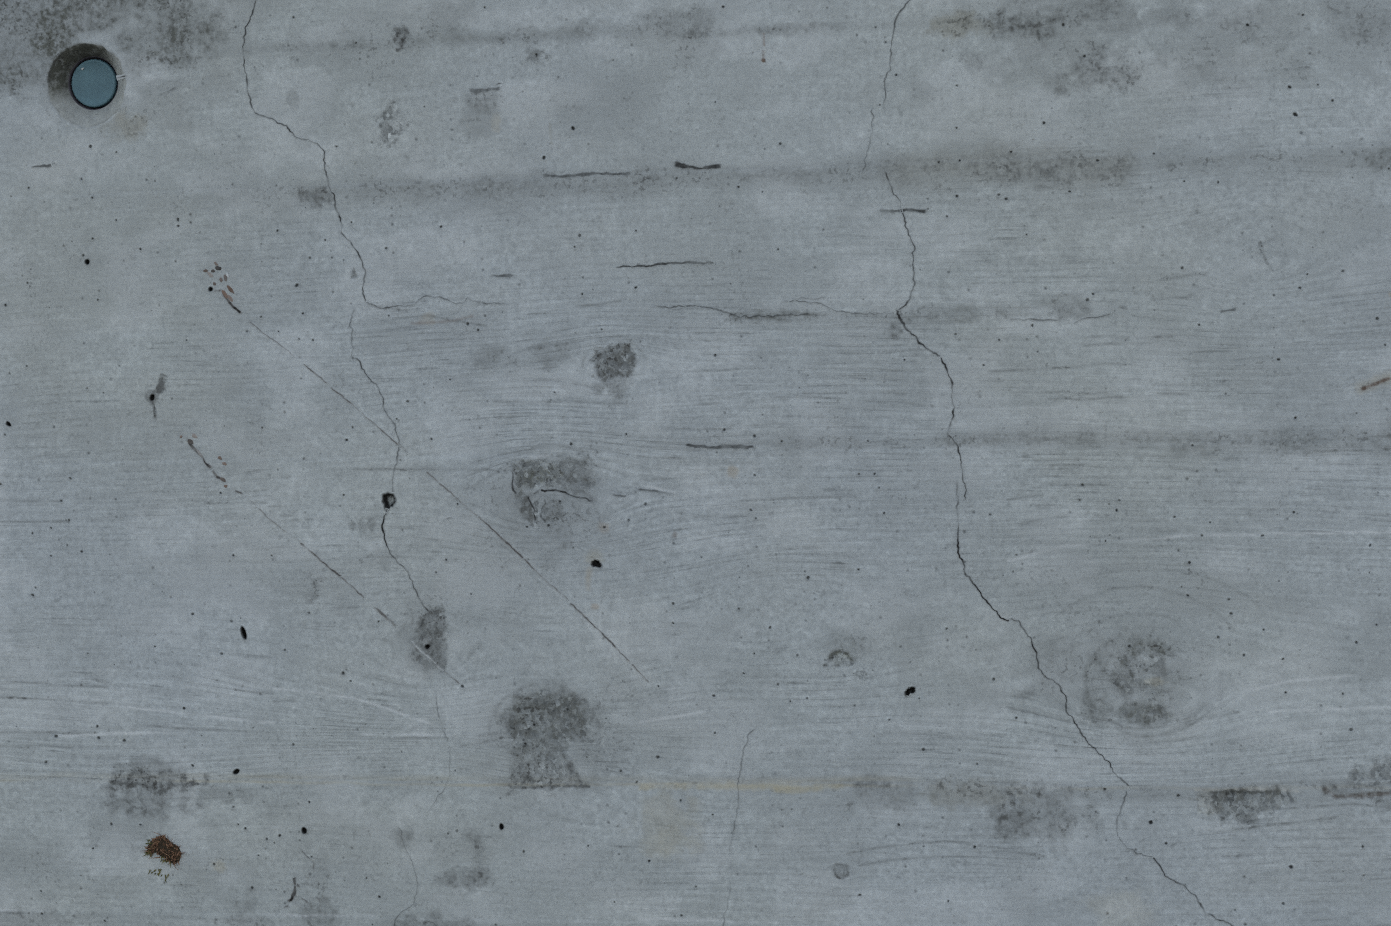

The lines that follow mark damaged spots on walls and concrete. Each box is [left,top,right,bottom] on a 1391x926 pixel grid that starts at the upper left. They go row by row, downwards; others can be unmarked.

crack [542,170,632,179]
crack [614,260,715,269]
crack [241,0,517,629]
crack [651,0,1238,926]
crack [510,470,674,524]
crack [392,689,453,926]
crack [282,849,322,911]